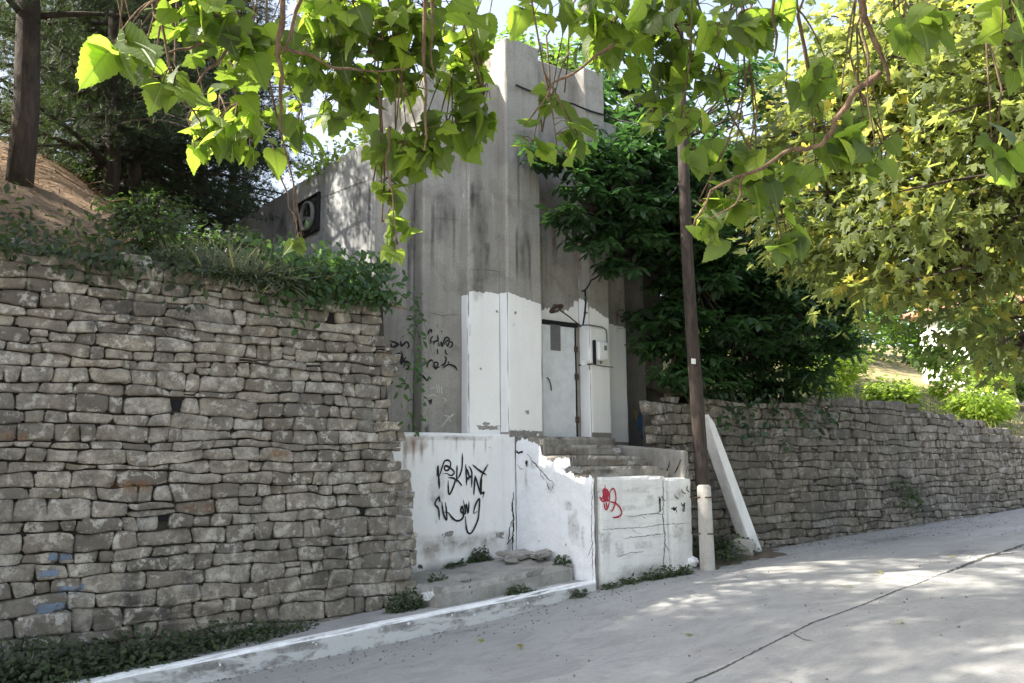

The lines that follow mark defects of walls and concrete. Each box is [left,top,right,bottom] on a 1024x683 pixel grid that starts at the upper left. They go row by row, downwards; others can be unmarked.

crack [507,450,556,550]
spalling [565,466,587,474]
crack [588,460,688,581]